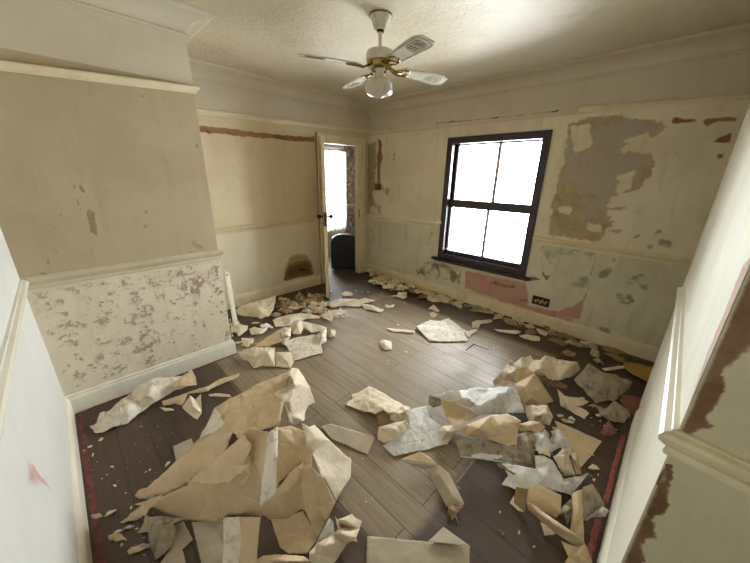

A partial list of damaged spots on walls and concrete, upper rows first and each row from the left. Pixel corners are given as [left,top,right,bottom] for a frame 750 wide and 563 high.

flaking render [199,125,315,143]
peeling [73,183,98,236]
peeling [463,270,589,323]
flaking render [679,256,750,436]
flaking render [622,466,675,563]